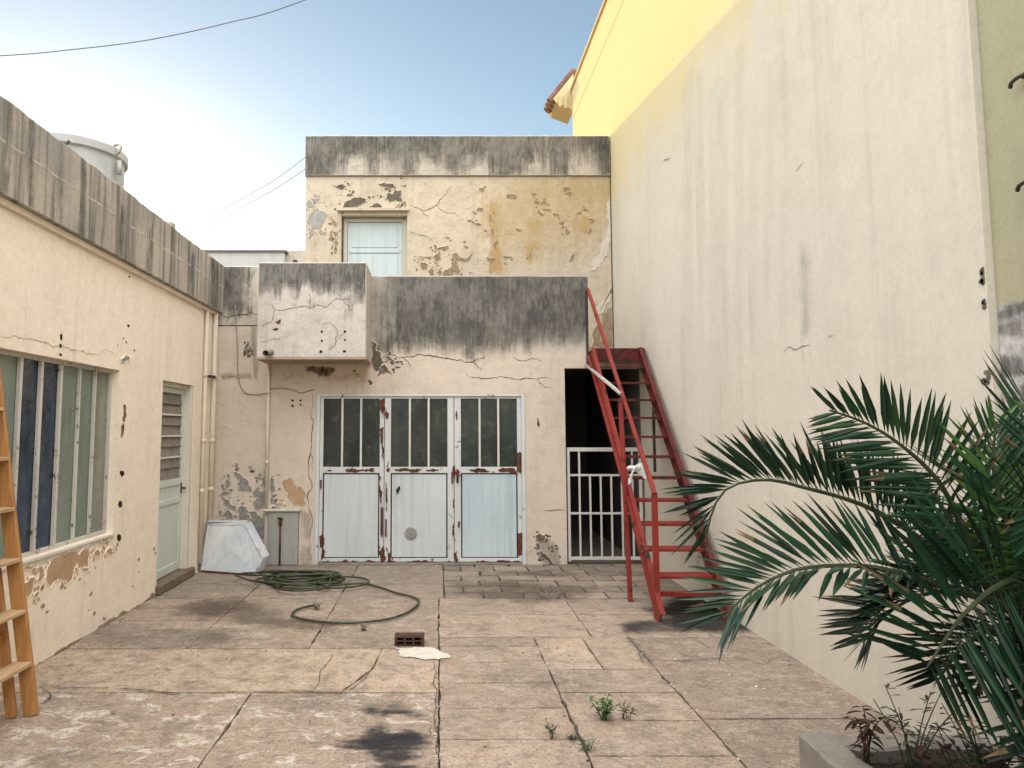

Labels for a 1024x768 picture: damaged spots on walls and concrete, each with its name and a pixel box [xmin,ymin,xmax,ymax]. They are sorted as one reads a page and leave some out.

water stain [305,136,610,175]
water stain [0,140,366,317]
peeling [306,177,406,254]
flaking render [414,237,473,276]
crack [224,293,352,350]
water stain [378,277,588,357]
crack [383,354,549,388]
peeling [218,462,308,544]
peeling [23,534,121,613]
rust [319,534,458,562]
crack [40,656,375,704]
water stain [342,705,431,768]